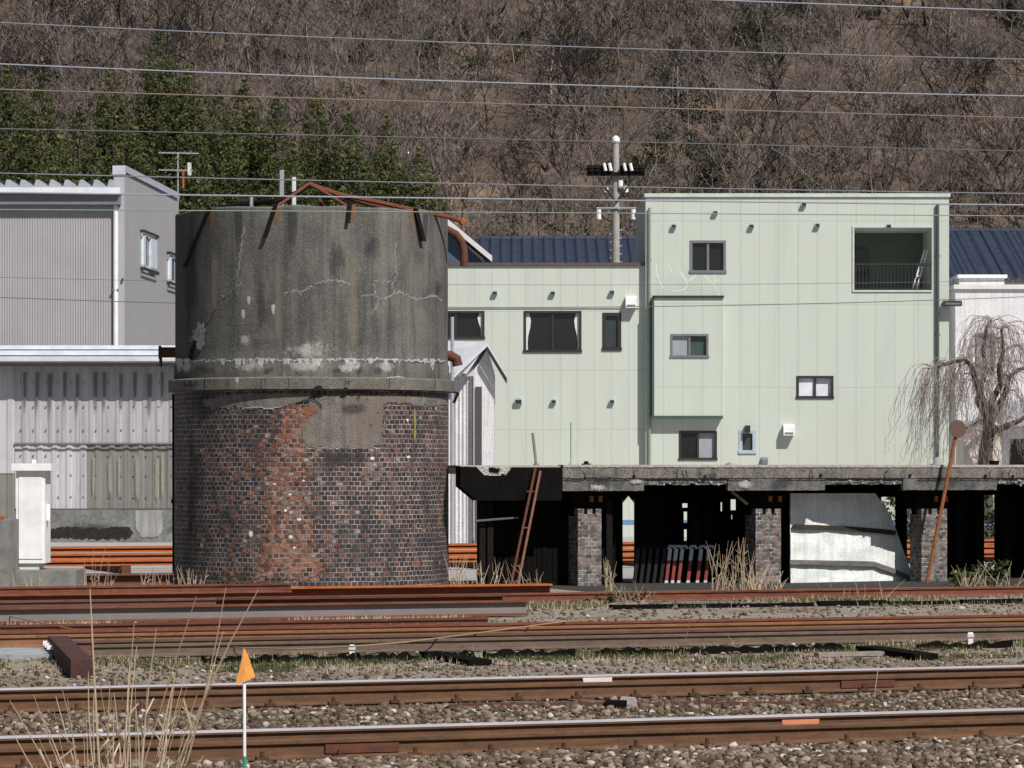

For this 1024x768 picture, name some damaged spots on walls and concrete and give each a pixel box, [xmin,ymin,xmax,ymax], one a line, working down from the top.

crack [206,225,245,324]
crack [285,240,444,314]
spalling [187,322,205,360]
damp [176,342,445,384]
spalling [177,403,345,584]